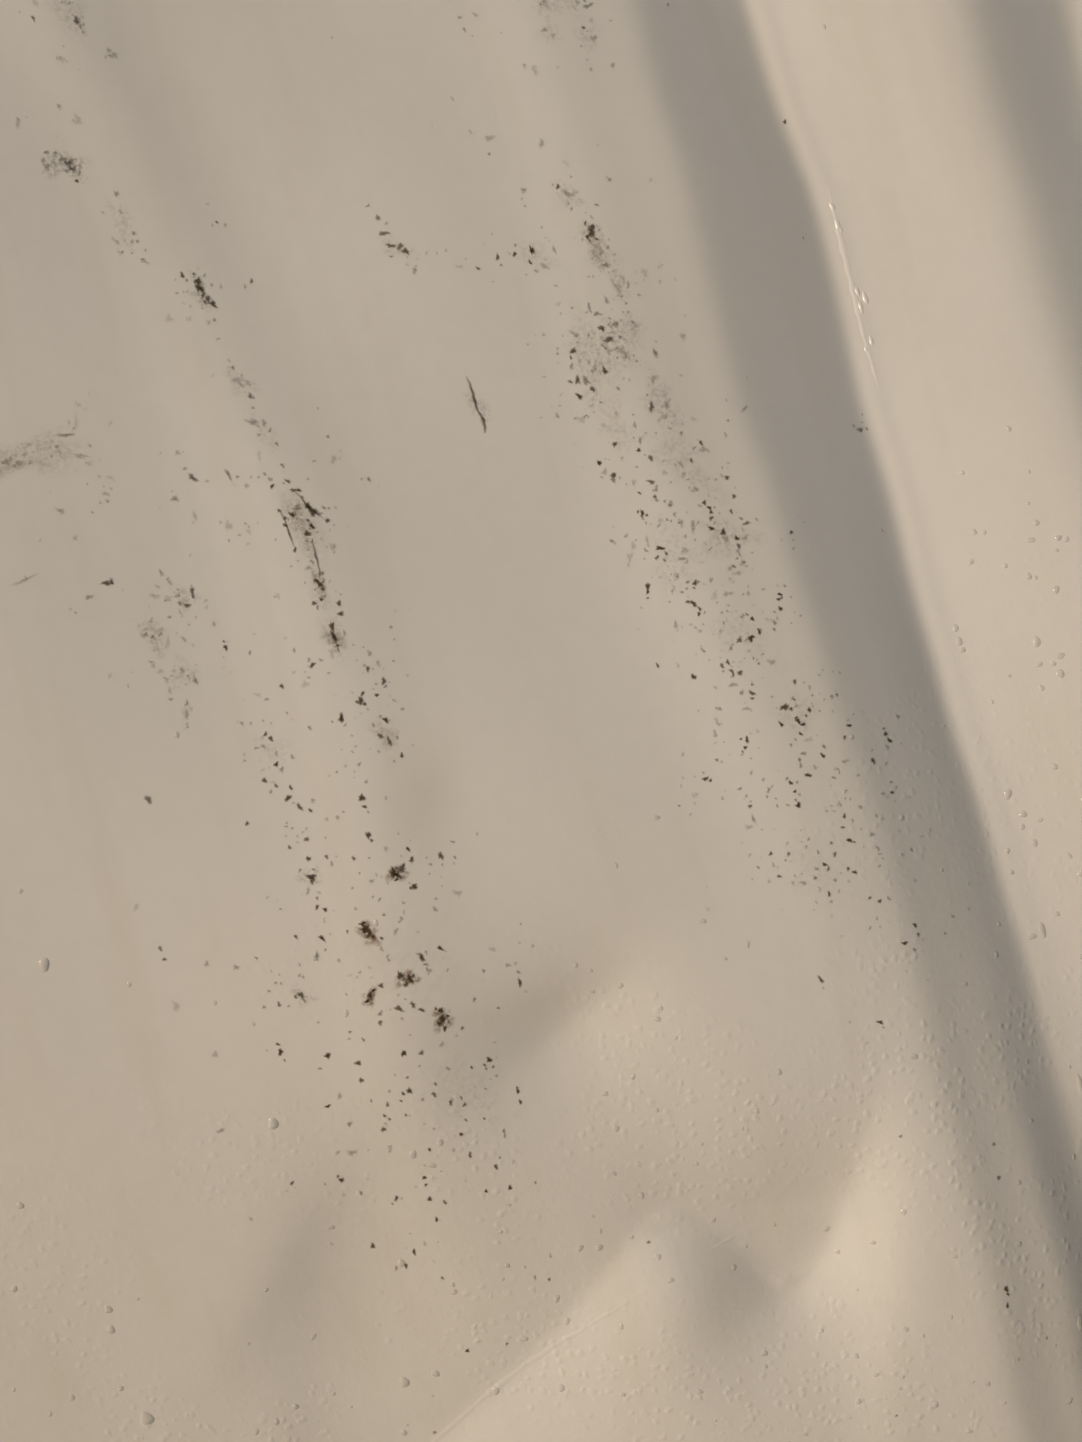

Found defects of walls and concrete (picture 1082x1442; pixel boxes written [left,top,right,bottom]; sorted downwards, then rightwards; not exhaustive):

water stain [181,272,216,307]
water stain [270,480,342,647]
water stain [390,847,417,889]
water stain [359,921,383,941]
water stain [397,946,443,986]
water stain [395,1003,463,1031]